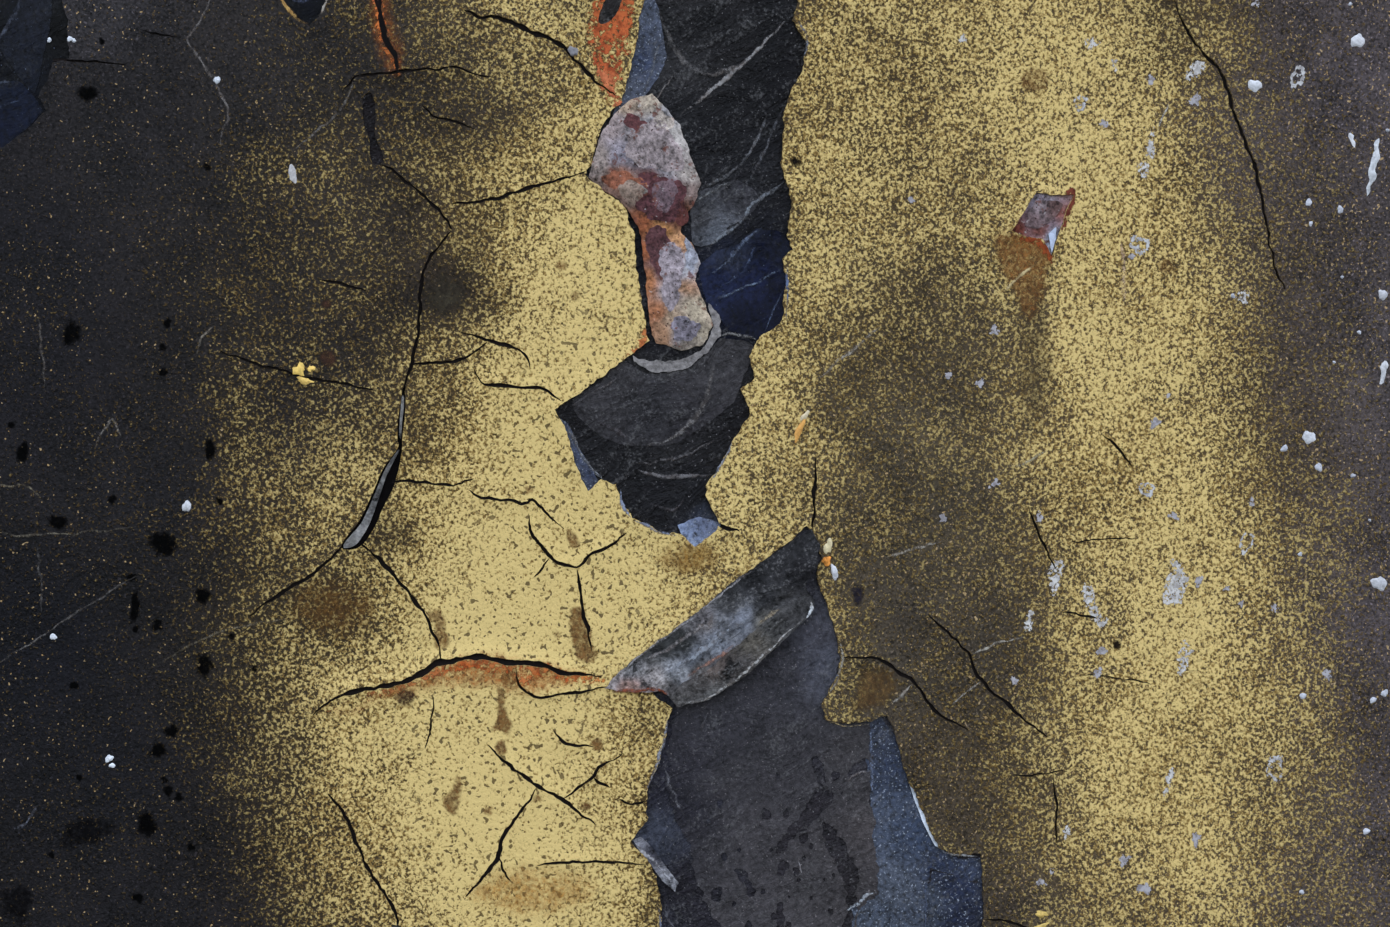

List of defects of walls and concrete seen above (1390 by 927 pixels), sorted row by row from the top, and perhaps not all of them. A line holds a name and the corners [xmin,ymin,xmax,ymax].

peeling [0,0,69,148]
peeling [280,0,327,25]
corrosion [372,0,400,76]
crack [464,10,615,95]
corrosion [568,0,721,373]
crack [1175,3,1285,289]
peeling [555,0,808,547]
crack [221,165,645,896]
corrosion [367,660,605,705]
peeling [606,526,984,927]
crack [844,656,968,730]
crack [328,794,399,924]